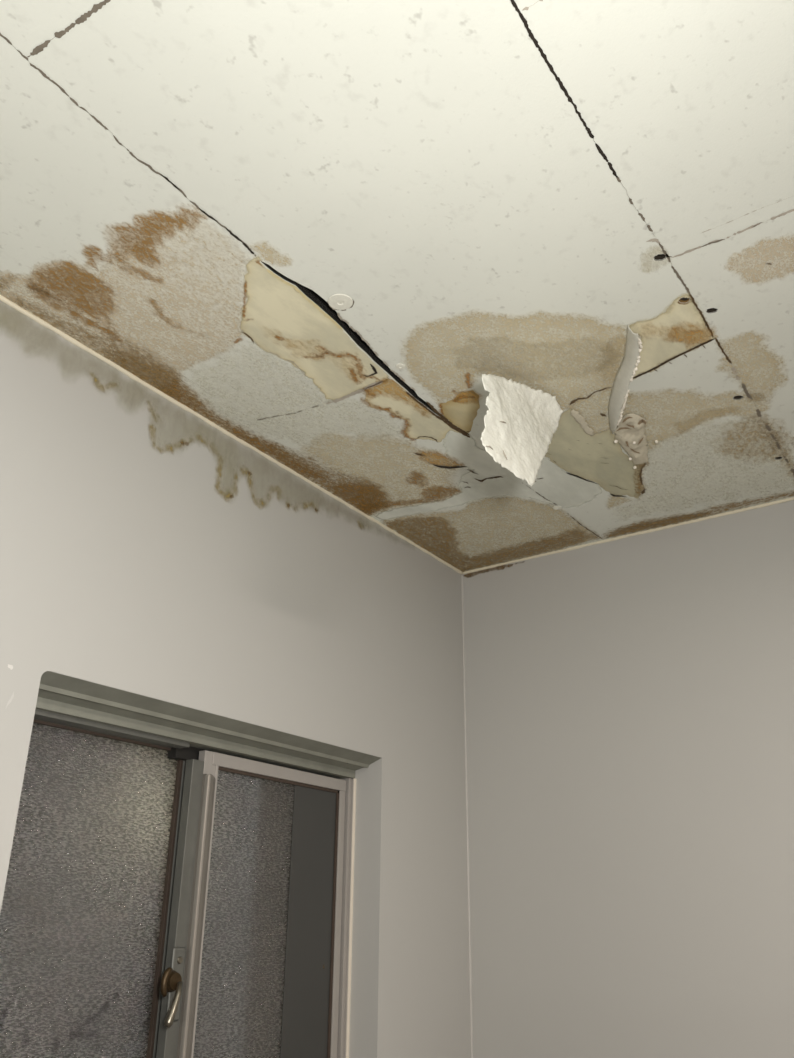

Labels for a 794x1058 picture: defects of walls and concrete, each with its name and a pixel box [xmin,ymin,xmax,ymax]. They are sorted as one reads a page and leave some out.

crack [0,0,256,256]
water stain [0,208,240,395]
crack [258,381,383,420]
peeling [234,257,649,519]
water stain [406,313,787,445]
crack [511,0,794,475]
peeling [630,295,714,379]
water stain [311,436,596,572]